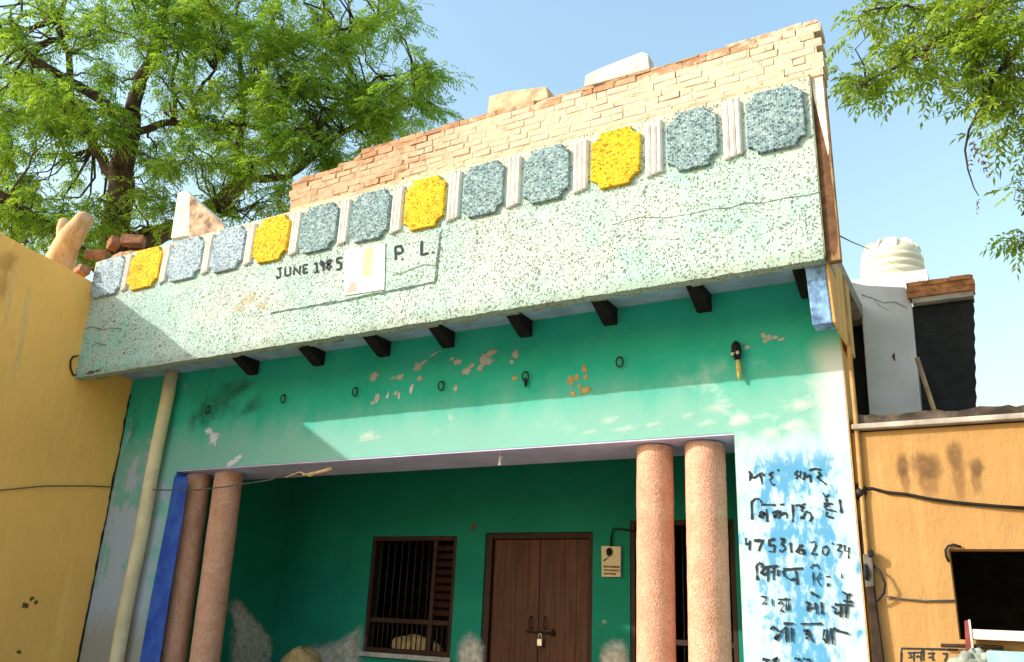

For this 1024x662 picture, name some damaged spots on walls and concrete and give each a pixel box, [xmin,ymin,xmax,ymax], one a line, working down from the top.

crack [612,192,820,225]
peeling [370,348,498,404]
peeling [566,365,590,397]
peeling [205,427,221,446]
leakage [231,601,272,662]
leakage [315,631,359,662]
leakage [459,638,482,662]